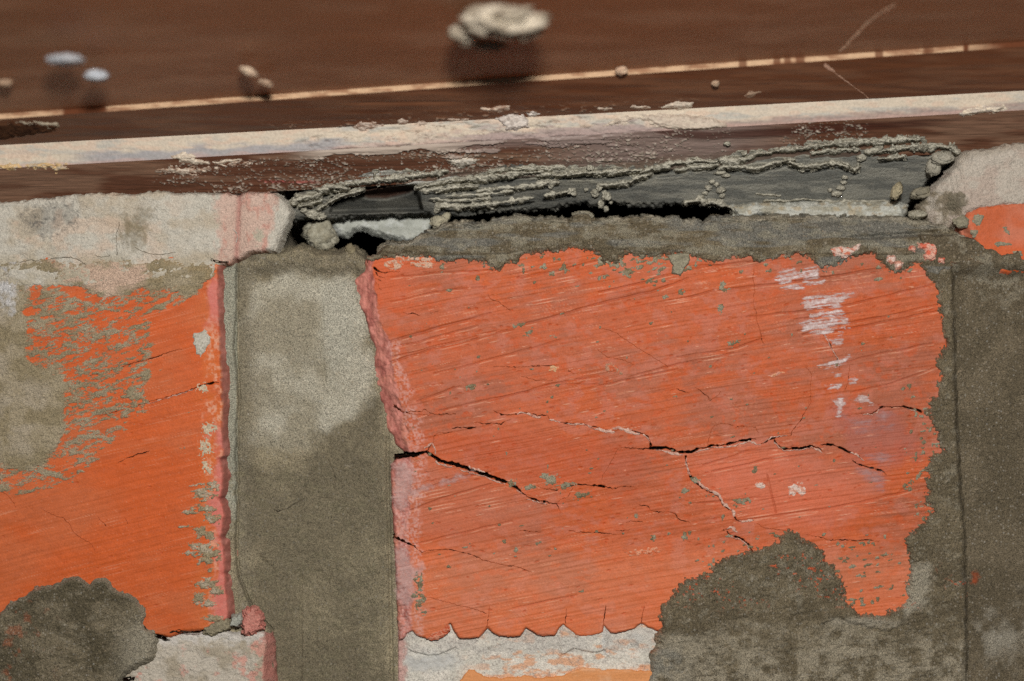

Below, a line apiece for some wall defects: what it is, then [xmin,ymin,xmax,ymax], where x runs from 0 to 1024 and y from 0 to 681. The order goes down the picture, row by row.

crack [839,405,922,416]
peeling [199,422,218,476]
crack [393,368,886,552]
crack [393,534,531,572]